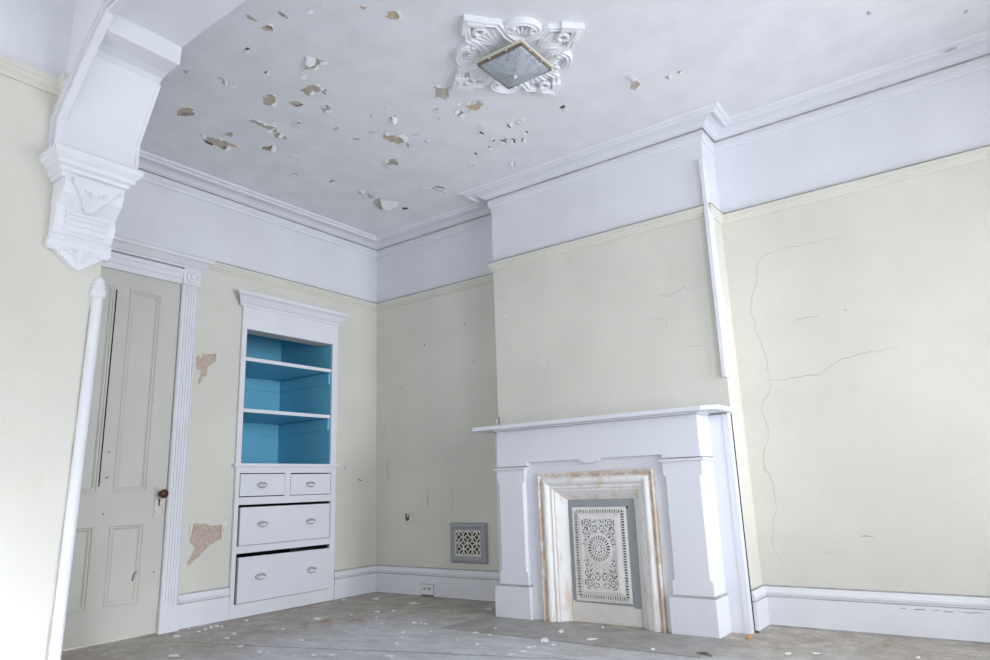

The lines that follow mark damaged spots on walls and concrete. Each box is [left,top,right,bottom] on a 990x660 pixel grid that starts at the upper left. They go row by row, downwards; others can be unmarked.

peeling [177,106,197,116]
peeling [263,56,332,115]
peeling [433,84,487,120]
peeling [201,131,238,151]
peeling [246,119,288,153]
peeling [349,115,420,148]
peeling [474,117,528,155]
peeling [358,189,409,211]
flaking render [195,352,218,384]
crack [750,235,892,576]
flaking render [187,521,227,566]